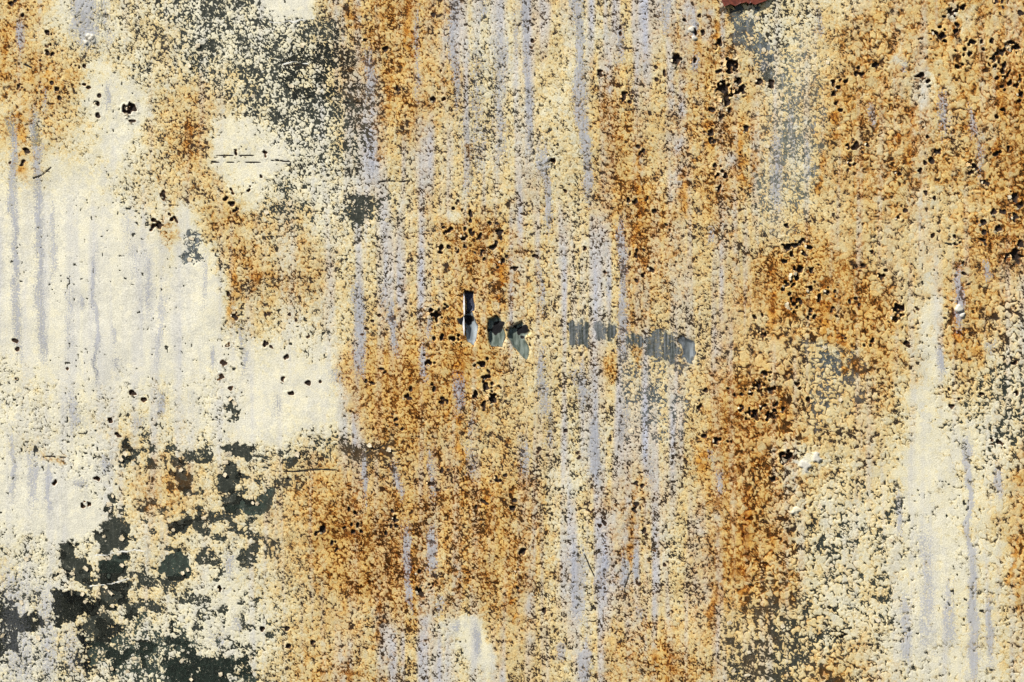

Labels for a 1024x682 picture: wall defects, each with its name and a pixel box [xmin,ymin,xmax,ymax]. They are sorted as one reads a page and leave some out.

spalling [122,102,137,125]
peeling [154,0,389,172]
leakage [362,50,376,102]
leakage [447,0,554,231]
leakage [569,0,594,208]
leakage [6,92,57,363]
leakage [350,283,367,376]
leakage [563,223,681,372]
peeling [0,413,404,682]
leakage [401,523,413,610]
leakage [425,524,438,572]
leakage [569,548,639,624]